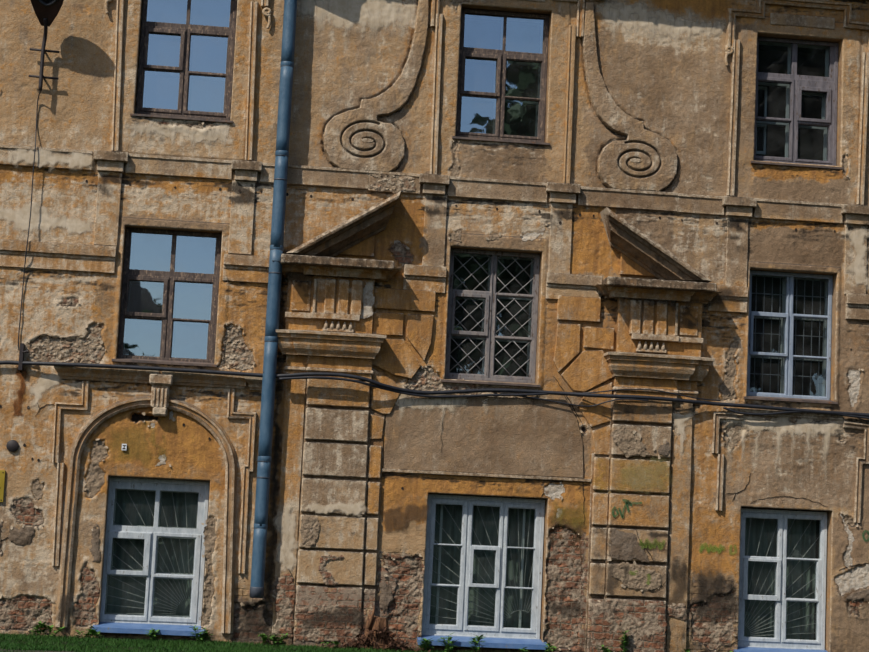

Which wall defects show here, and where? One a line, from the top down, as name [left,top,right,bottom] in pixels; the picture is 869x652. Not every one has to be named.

spalling [28,323,106,364]
spalling [218,323,255,370]
spalling [11,480,44,526]
spalling [83,438,108,497]
leakage [384,505,427,532]
crack [726,473,827,507]
spalling [544,482,738,652]
spalling [835,511,869,616]
spalling [0,595,54,631]
leakage [694,571,737,619]